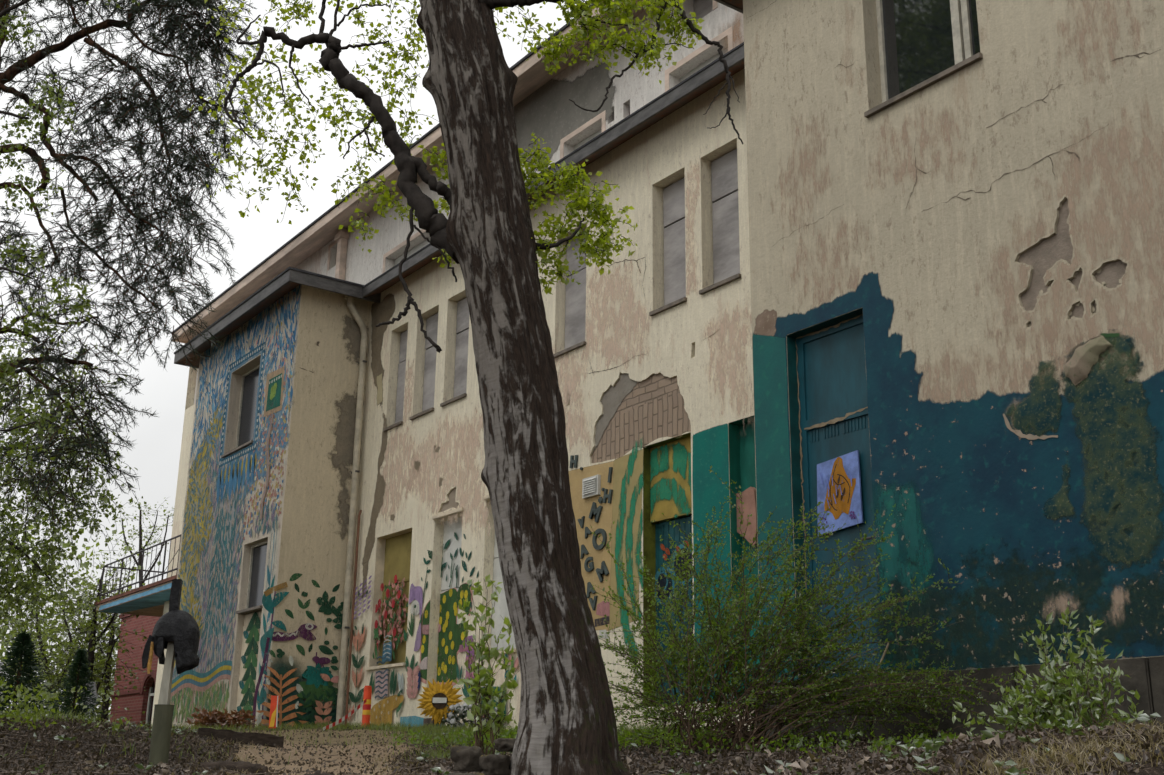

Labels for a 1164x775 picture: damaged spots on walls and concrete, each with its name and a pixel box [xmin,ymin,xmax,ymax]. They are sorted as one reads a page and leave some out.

crack [986,84,1063,128]
crack [905,124,1109,215]
flaking render [1017,199,1127,327]
flaking render [555,262,691,463]
peeling [922,335,1071,403]
water stain [1126,340,1143,371]